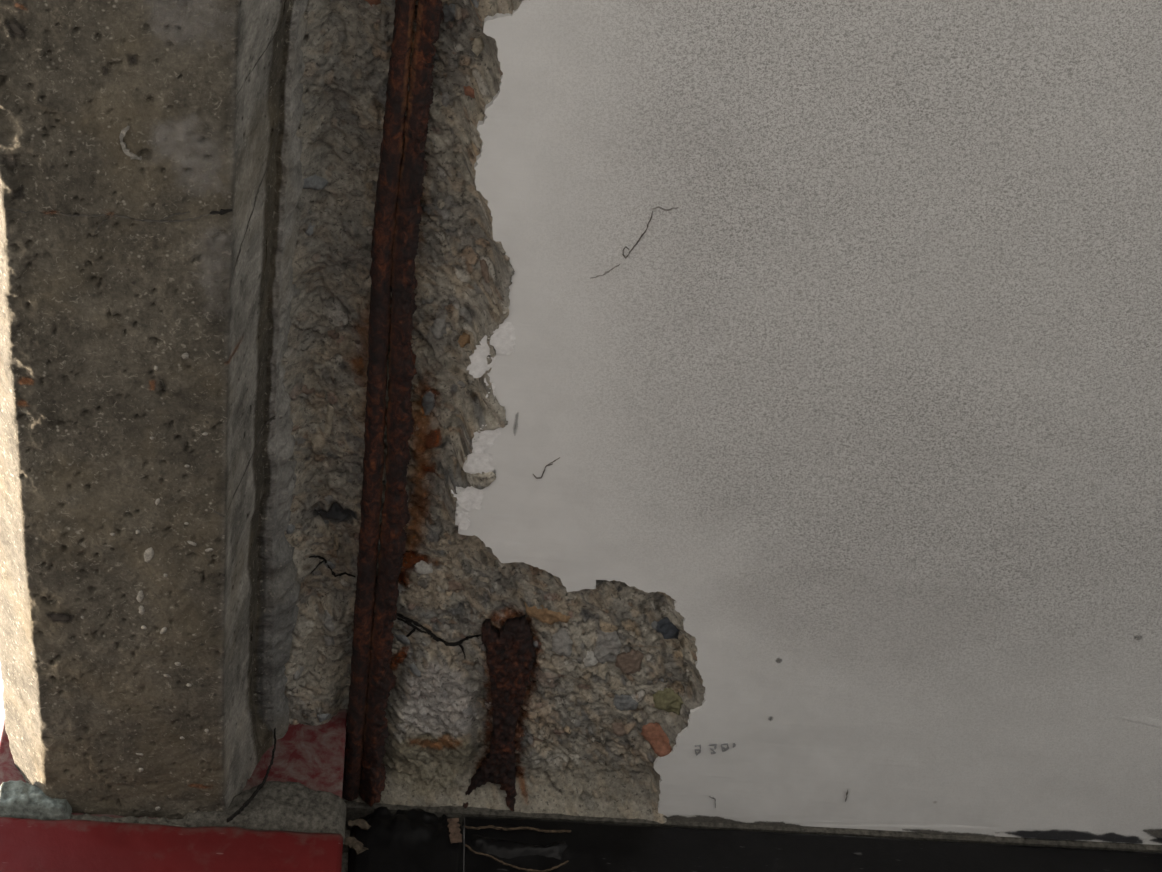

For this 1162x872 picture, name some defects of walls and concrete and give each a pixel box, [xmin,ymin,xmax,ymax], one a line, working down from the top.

spalling [281,0,395,726]
corrosion [342,0,444,807]
crack [396,613,481,659]
corrosion [462,606,541,811]
spalling [342,0,803,827]
peeling [903,829,995,837]